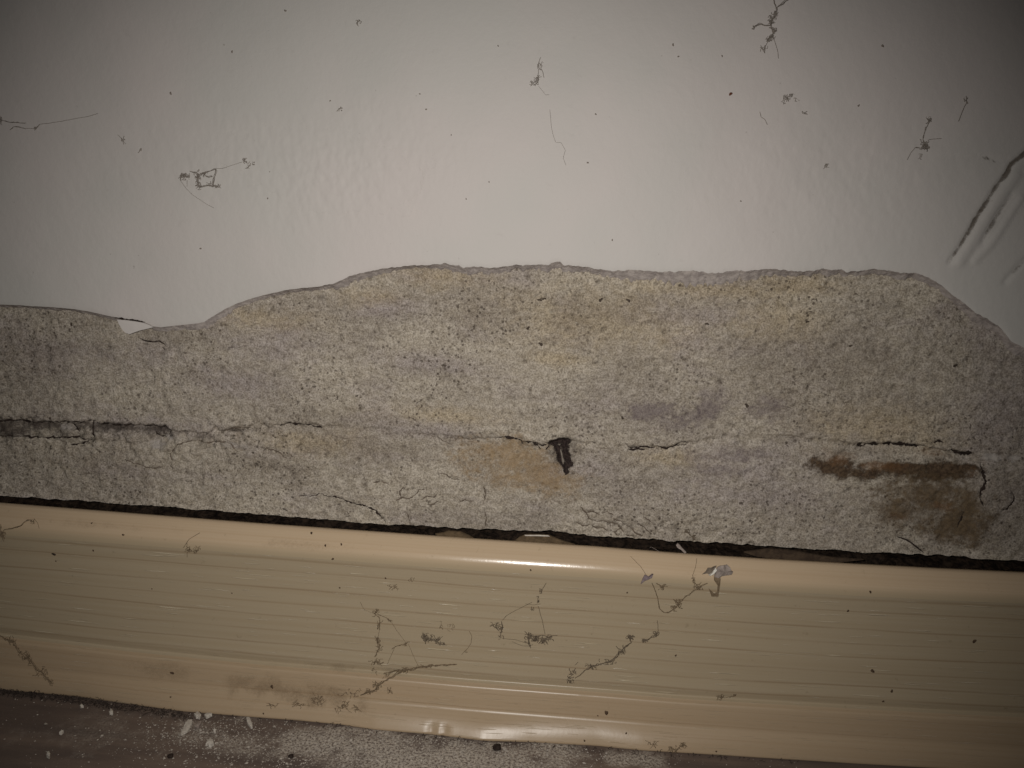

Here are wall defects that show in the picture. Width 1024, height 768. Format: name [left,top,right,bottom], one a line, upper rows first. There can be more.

crack [0,419,322,469]
peeling [0,262,1024,561]
crack [594,436,715,451]
crack [837,439,1015,527]